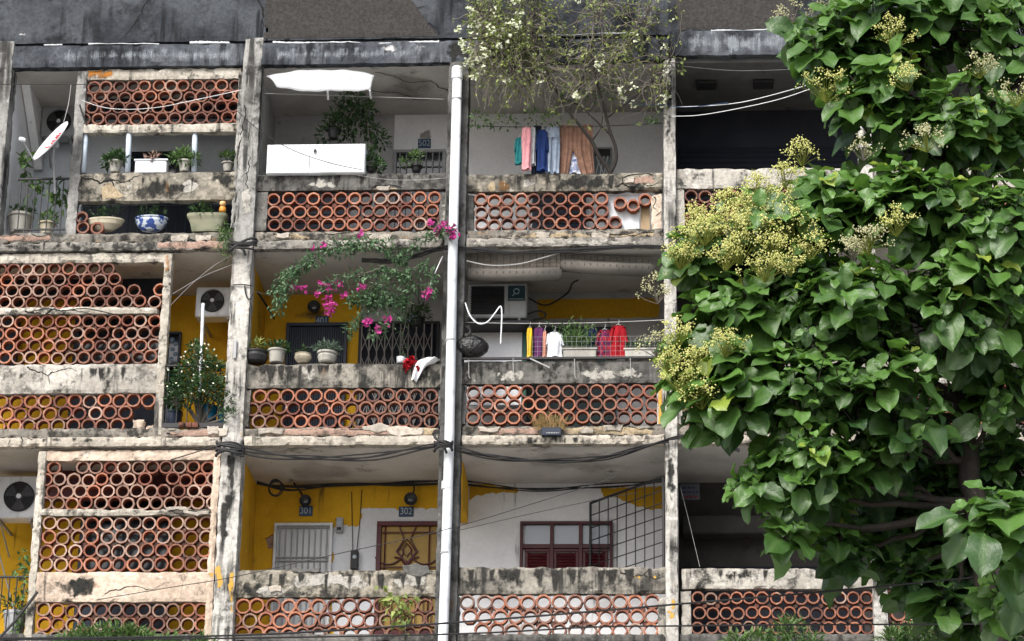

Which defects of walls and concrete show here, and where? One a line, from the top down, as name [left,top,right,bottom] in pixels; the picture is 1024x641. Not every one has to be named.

damp [694,35,779,52]
crack [236,105,251,188]
damp [142,178,197,198]
damp [213,172,236,193]
damp [221,455,235,552]
damp [57,577,94,598]
damp [489,569,522,587]
damp [534,569,581,590]
damp [598,568,634,583]